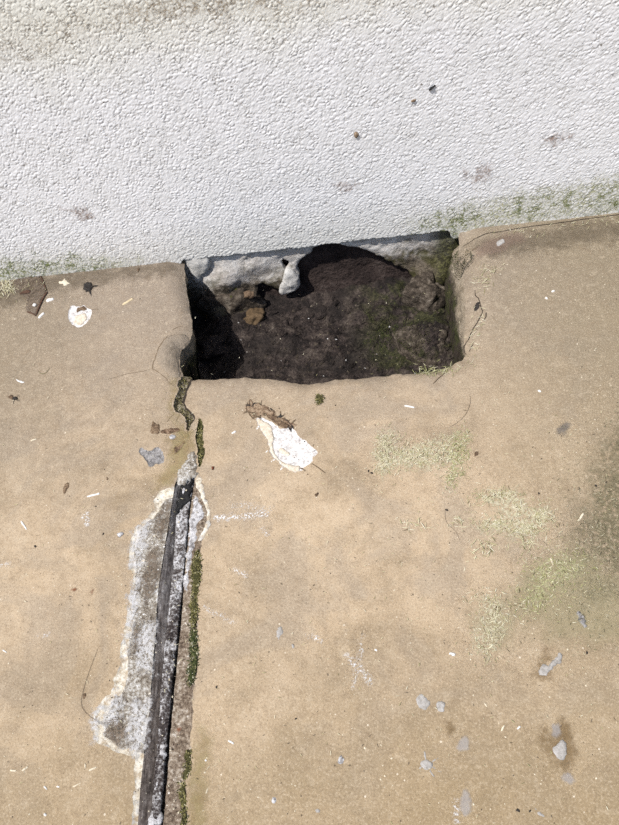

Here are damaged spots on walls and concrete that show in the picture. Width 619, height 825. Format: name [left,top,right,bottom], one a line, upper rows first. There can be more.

spalling [180,257,211,382]
peeling [279,267,300,295]
spalling [444,246,466,369]
spalling [139,447,164,467]
crack [114,326,205,467]
spalling [90,487,174,825]
spalling [163,472,211,825]